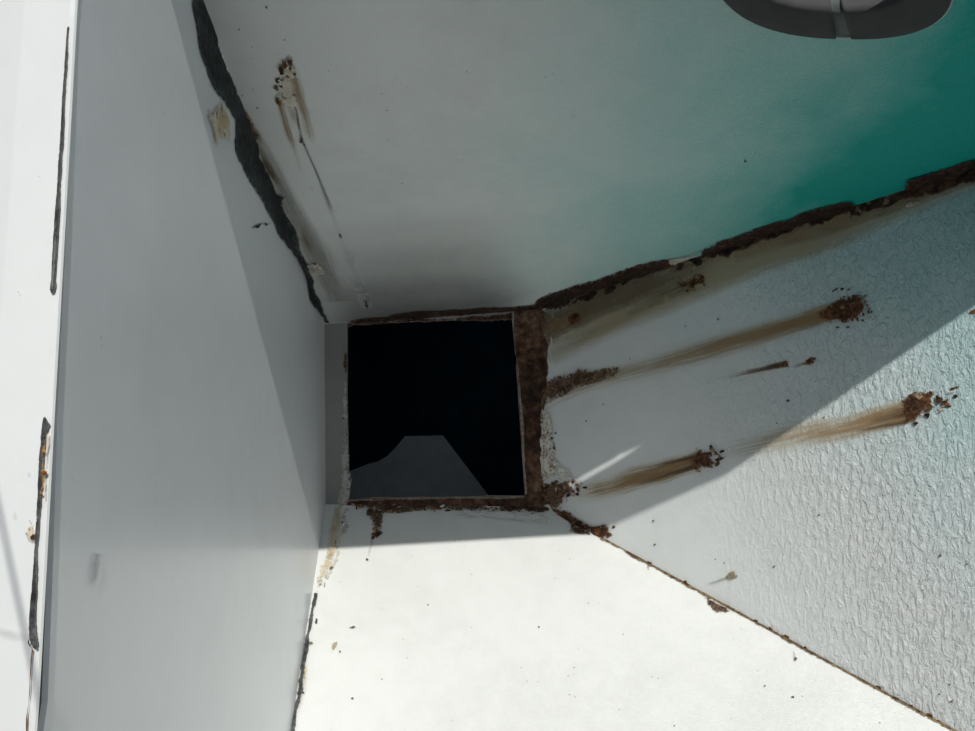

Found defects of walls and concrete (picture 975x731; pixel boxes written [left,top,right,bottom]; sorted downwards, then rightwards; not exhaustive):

rust [273,56,307,142]
rust [653,274,705,299]
rust [346,288,873,539]
rust [776,386,959,442]
crack [597,536,957,731]